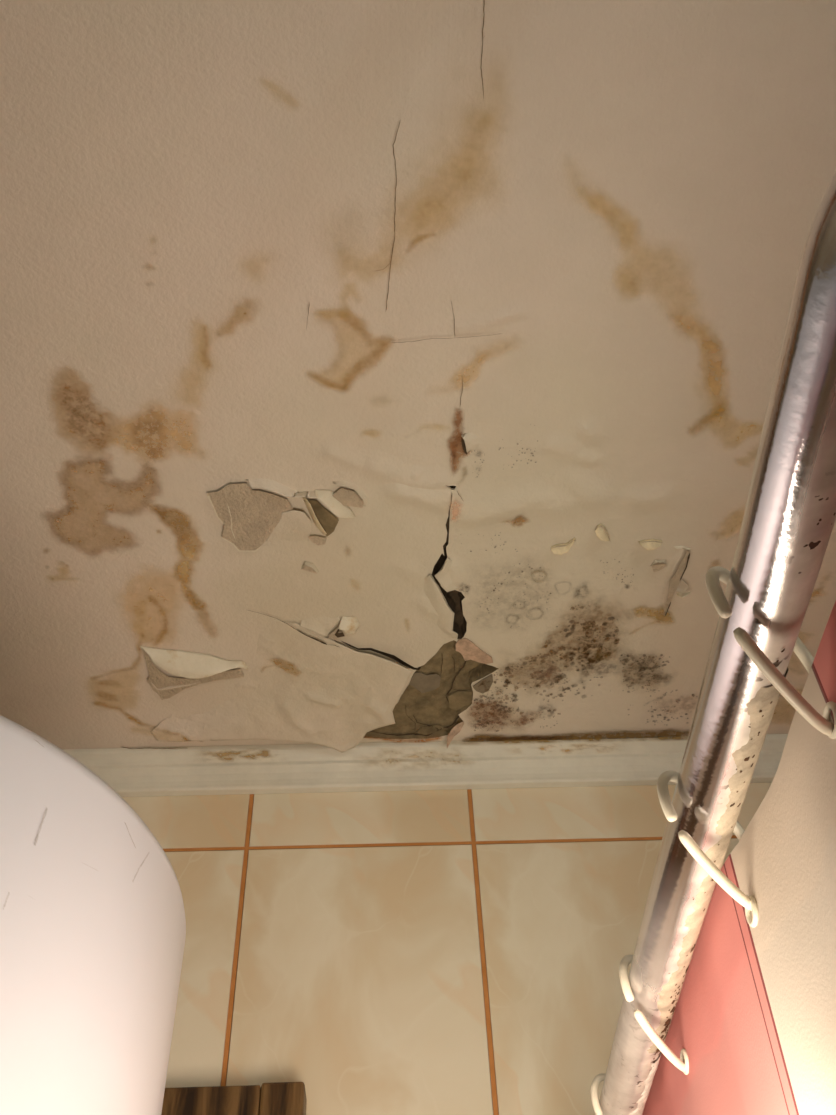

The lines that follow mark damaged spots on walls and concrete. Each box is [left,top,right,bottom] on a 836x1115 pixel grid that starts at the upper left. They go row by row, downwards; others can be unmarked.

crack [478,0,486,100]
peeling [207,478,368,552]
crack [431,486,467,639]
peeling [139,558,499,753]
crack [249,610,421,670]
water stain [464,605,689,751]